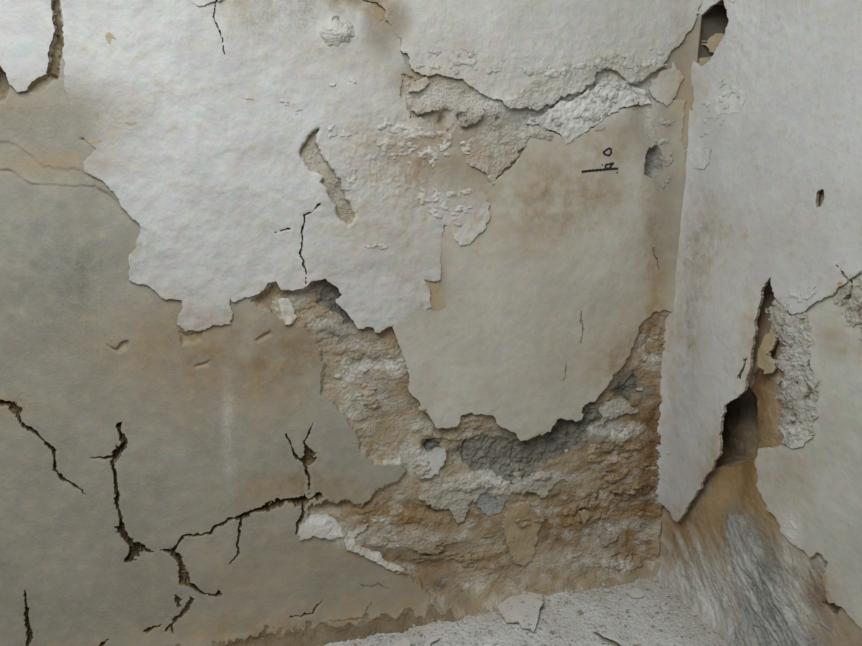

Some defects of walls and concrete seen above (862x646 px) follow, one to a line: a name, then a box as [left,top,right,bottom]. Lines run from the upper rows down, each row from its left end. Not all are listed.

flaking render [0,0,57,100]
crack [46,0,64,79]
crack [213,0,225,55]
crack [274,203,319,272]
flaking render [60,0,722,646]
flaking render [392,0,862,646]
crack [0,396,328,646]